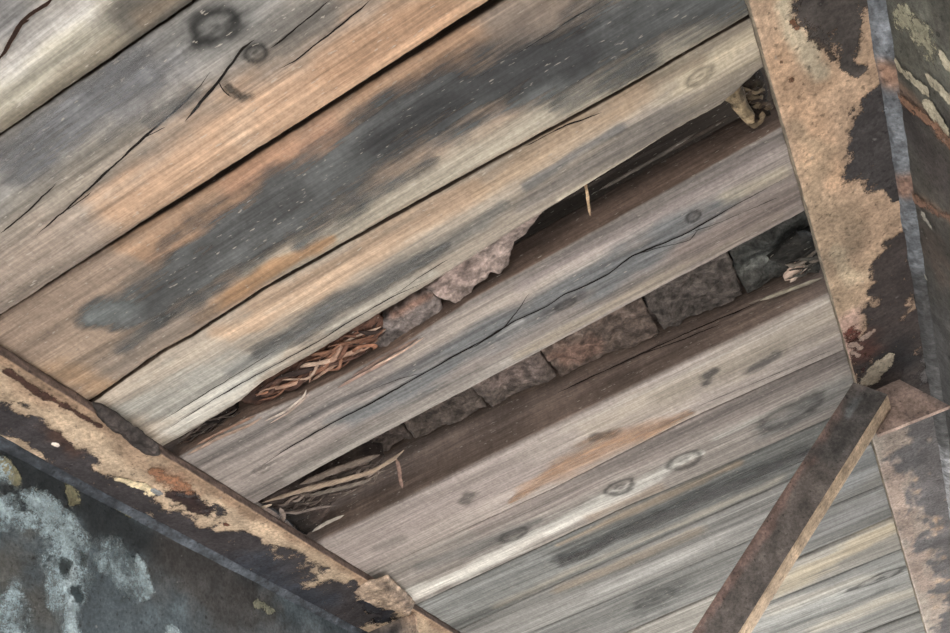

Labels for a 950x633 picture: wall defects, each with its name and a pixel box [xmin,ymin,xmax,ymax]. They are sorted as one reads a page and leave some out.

leakage [0,52,167,184]
crack [0,0,370,235]
leakage [76,0,749,358]
peeling [892,3,950,135]
crack [259,184,779,468]
peeling [847,329,876,358]
peeling [859,353,895,385]
rust [843,232,931,396]
peeling [0,456,22,487]
leakage [0,458,154,633]
peeling [114,478,163,497]
rust [0,368,402,629]